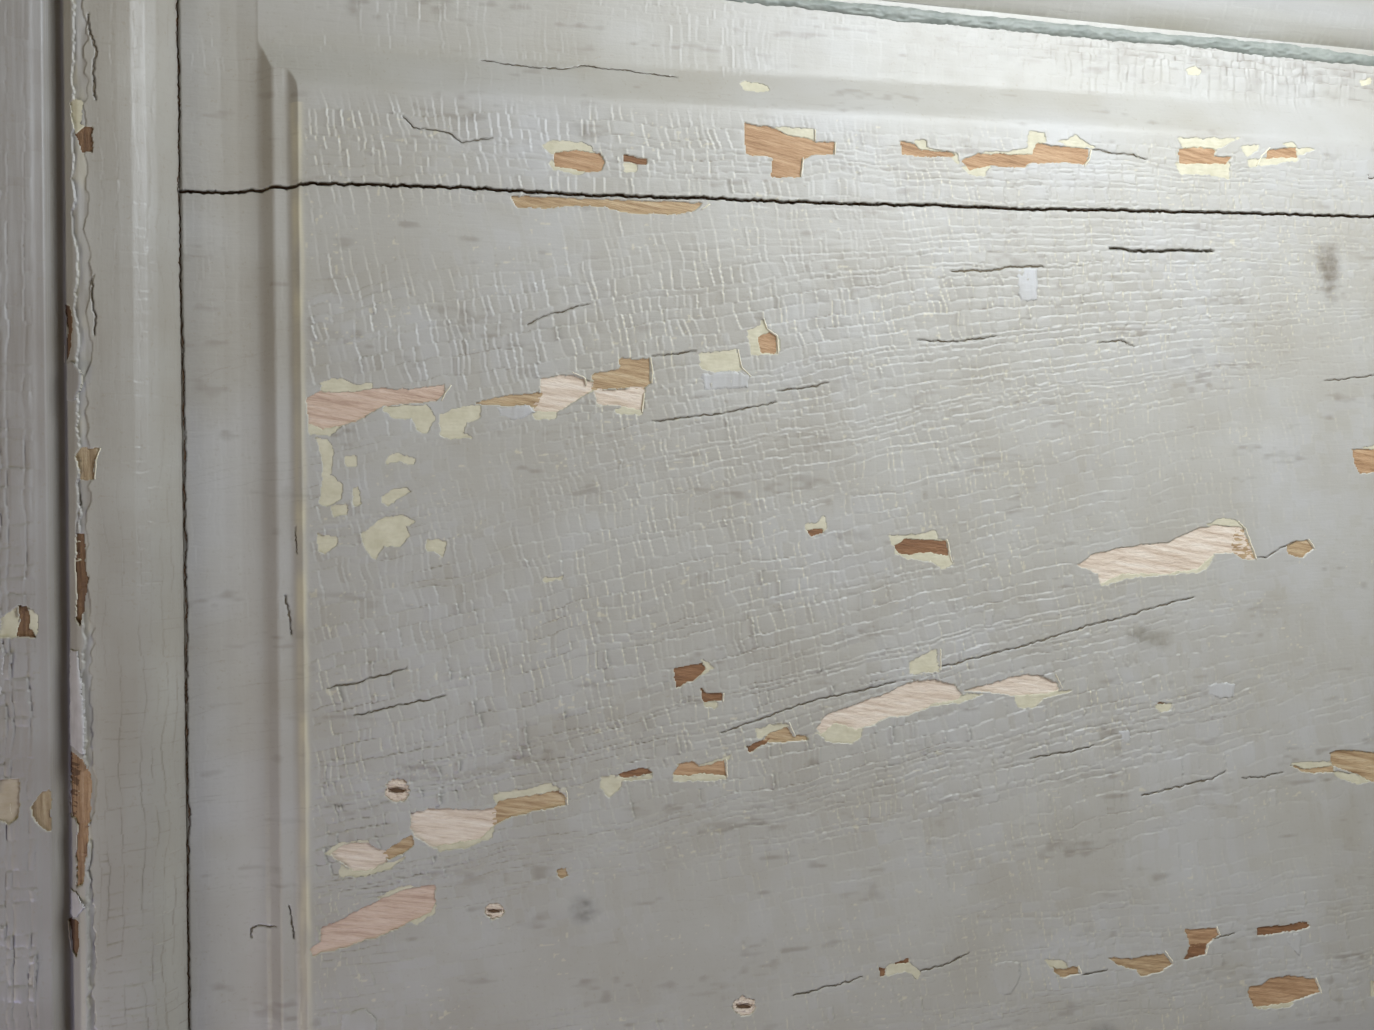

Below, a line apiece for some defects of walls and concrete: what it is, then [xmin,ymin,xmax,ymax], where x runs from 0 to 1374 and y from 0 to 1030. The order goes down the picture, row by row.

crack [88,13,98,98]
peeling [744,123,836,178]
peeling [900,131,1095,177]
crack [176,1,1374,430]
peeling [306,357,653,517]
peeling [1078,518,1258,586]
crack [943,597,1194,666]
crack [183,438,191,1029]
crack [327,669,441,715]
crack [721,681,896,733]
peeling [746,649,1071,752]
peeling [67,649,92,955]